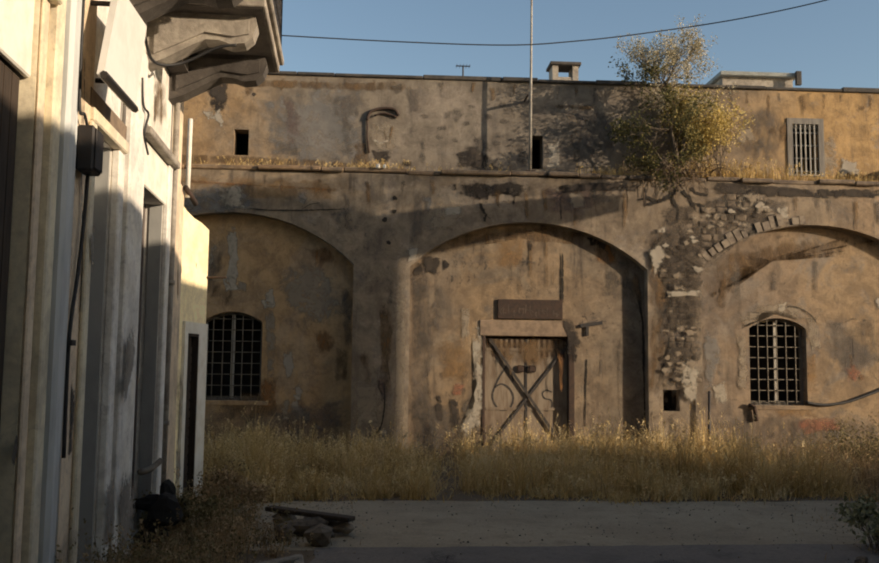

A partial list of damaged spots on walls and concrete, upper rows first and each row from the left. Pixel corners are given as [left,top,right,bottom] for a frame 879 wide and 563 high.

spalling [203,83,228,126]
flaking render [650,193,806,402]
peeling [737,302,820,389]